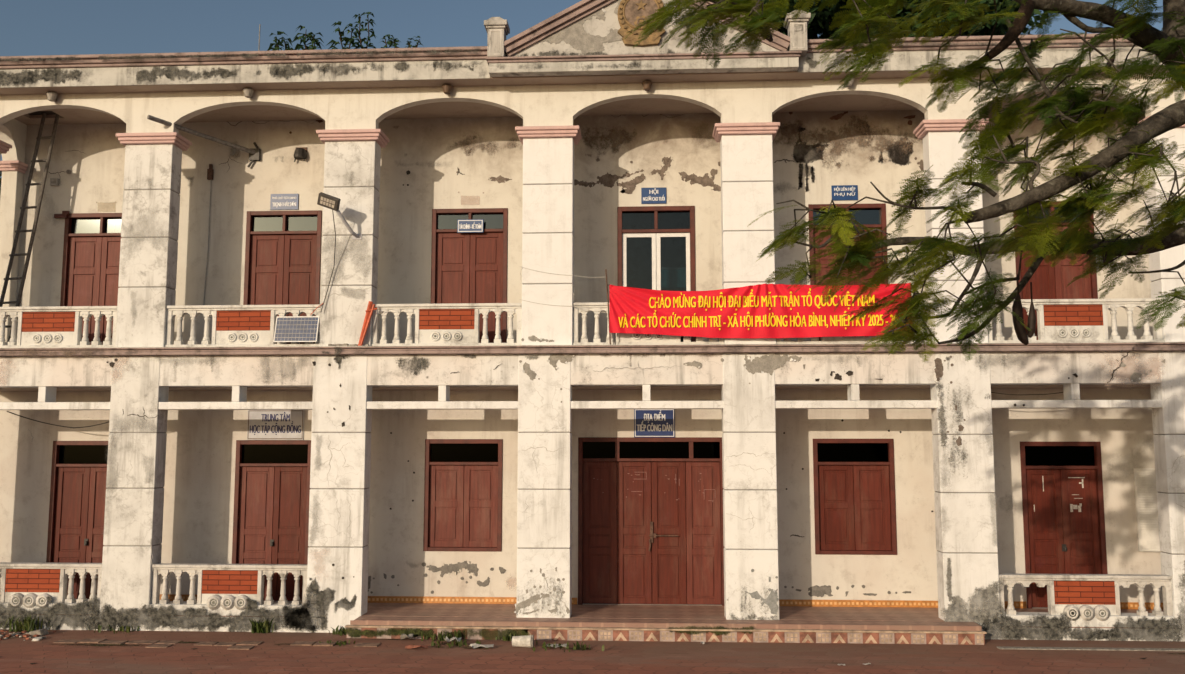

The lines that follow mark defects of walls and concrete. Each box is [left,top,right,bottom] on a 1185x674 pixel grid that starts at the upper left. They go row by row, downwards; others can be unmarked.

water stain [0,57,82,86]
water stain [98,49,478,83]
peeling [574,156,721,194]
water stain [322,347,345,369]
peeling [743,353,805,384]
peeling [422,561,506,594]
water stain [0,577,357,633]
peeling [746,576,911,614]
water stain [942,558,1185,641]